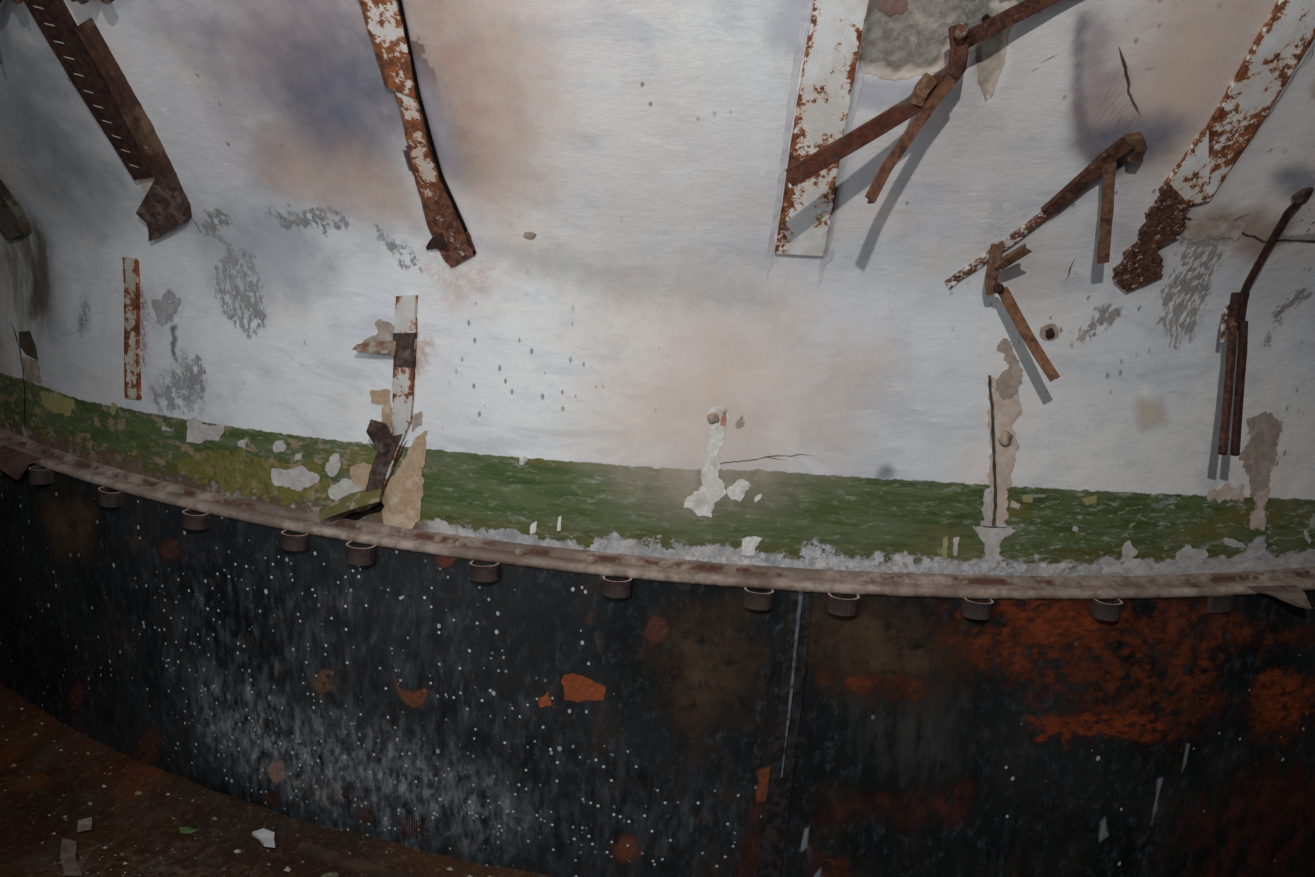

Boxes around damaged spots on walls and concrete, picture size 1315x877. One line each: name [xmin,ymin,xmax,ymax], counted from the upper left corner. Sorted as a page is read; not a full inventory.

rust [415,7,525,196]
spalling [859,0,1024,80]
spalling [968,26,1011,101]
peeling [202,208,266,338]
crack [1181,213,1315,244]
peeling [151,290,206,397]
peeling [76,417,372,507]
peeling [370,389,393,432]
peeling [381,412,427,529]
peeling [683,338,1315,576]
efflorescence [145,556,672,877]
rust [938,598,1315,749]